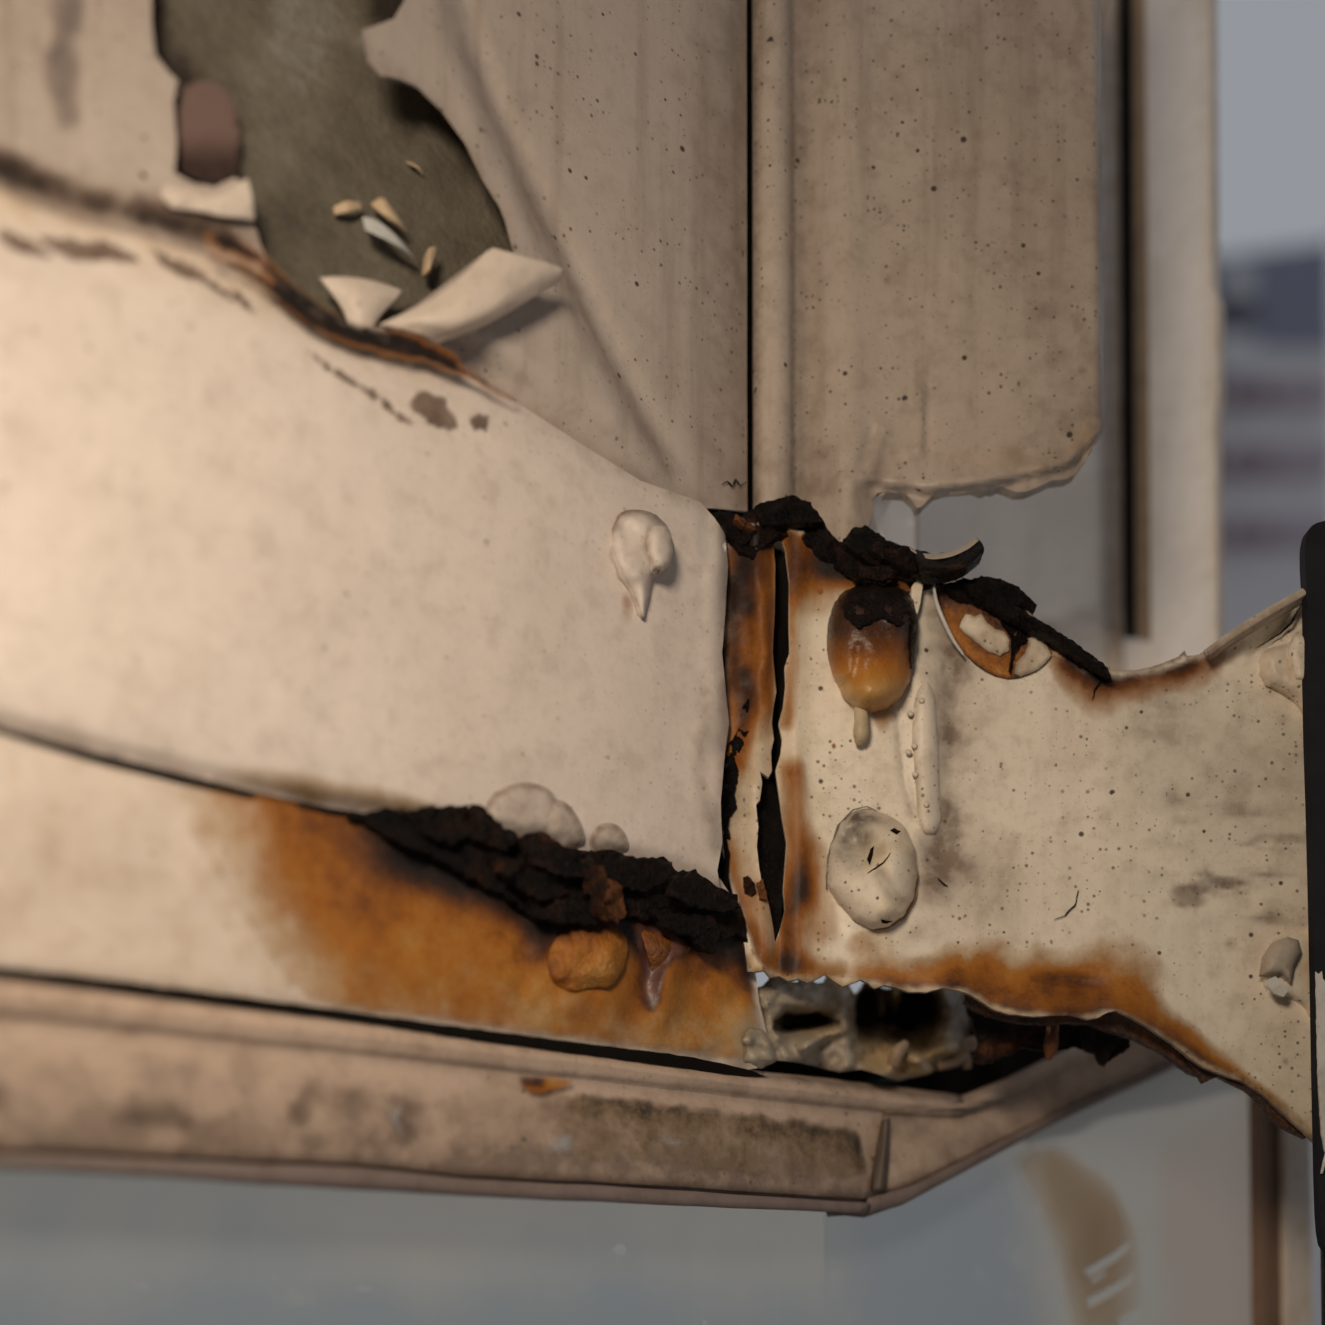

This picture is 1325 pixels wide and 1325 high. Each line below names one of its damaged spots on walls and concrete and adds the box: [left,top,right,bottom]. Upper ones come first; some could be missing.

peeling [0,228,138,261]
peeling [152,0,564,344]
peeling [314,354,488,430]
crack [717,548,789,942]
rust [711,495,1225,773]
peeling [911,580,1052,680]
rust [217,761,1306,1139]